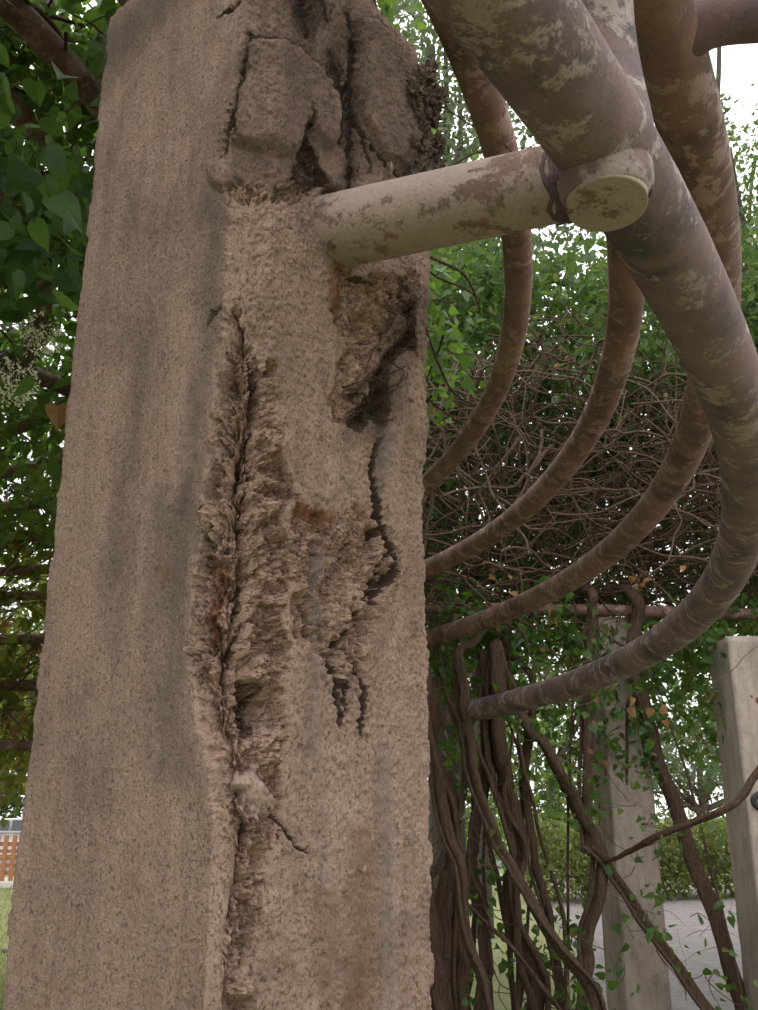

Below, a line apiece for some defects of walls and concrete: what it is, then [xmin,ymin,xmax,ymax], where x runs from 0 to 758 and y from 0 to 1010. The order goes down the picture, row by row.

crack [216,1,241,20]
crack [221,32,276,157]
crack [299,0,398,189]
crack [334,266,399,299]
spalling [183,166,421,1010]
crack [325,434,402,736]